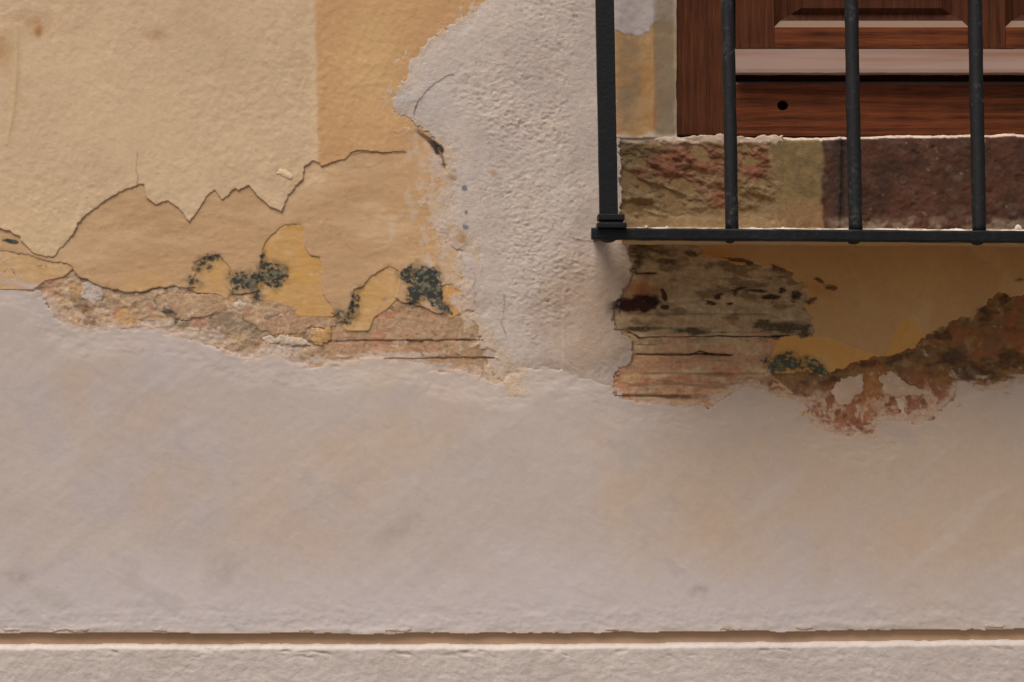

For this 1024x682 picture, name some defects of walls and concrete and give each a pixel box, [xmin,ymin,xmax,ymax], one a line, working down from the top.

damp [188,254,220,285]
damp [229,254,289,299]
peeling [0,127,519,384]
damp [335,287,360,324]
damp [400,264,453,315]
flaking render [612,244,1024,438]
damp [761,351,839,383]